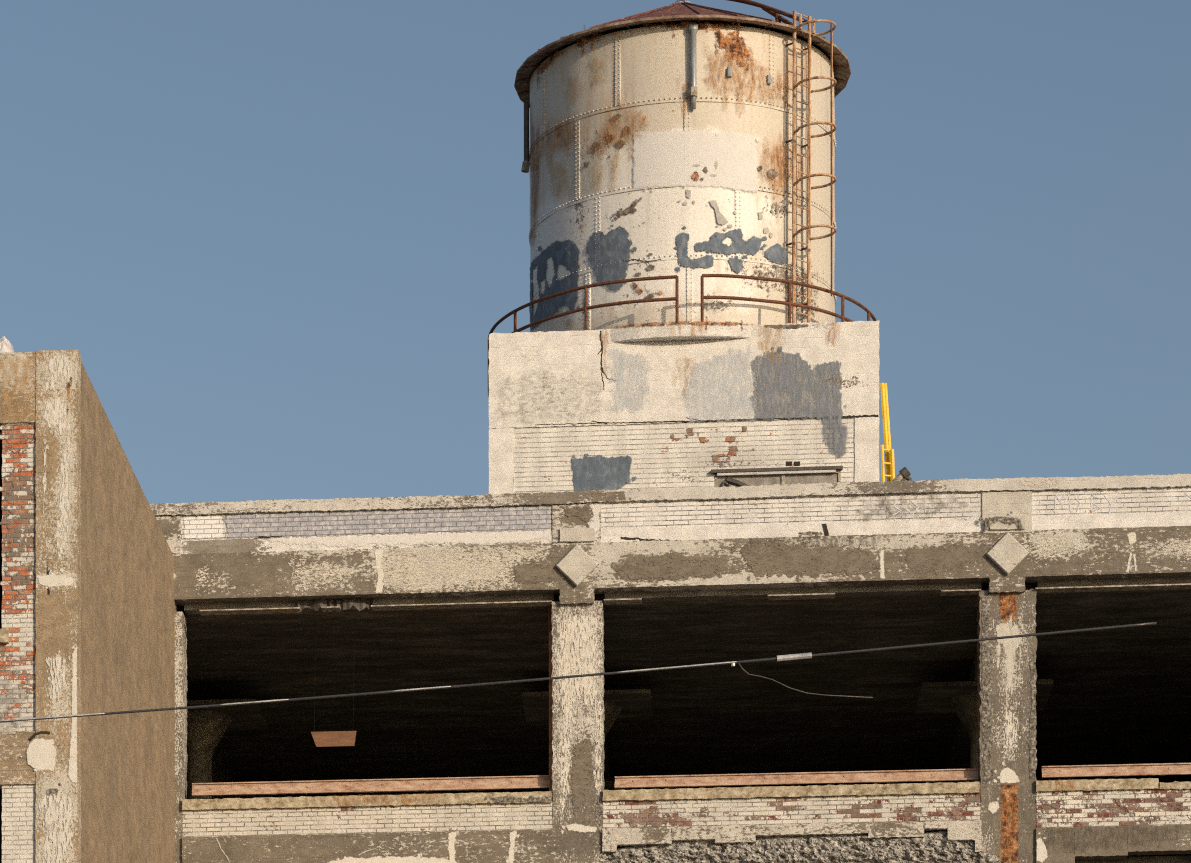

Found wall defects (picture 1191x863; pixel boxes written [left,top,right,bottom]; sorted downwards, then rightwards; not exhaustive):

corrosion [576,27,602,81]
corrosion [643,21,787,106]
corrosion [583,112,647,185]
corrosion [758,146,789,187]
crack [598,331,617,385]
flaking render [671,428,709,443]
crack [536,414,878,425]
flaking render [707,426,762,468]
peeling [195,560,215,596]
flaking render [0,353,77,863]
spalling [485,607,1000,863]
flaking render [981,593,1191,863]